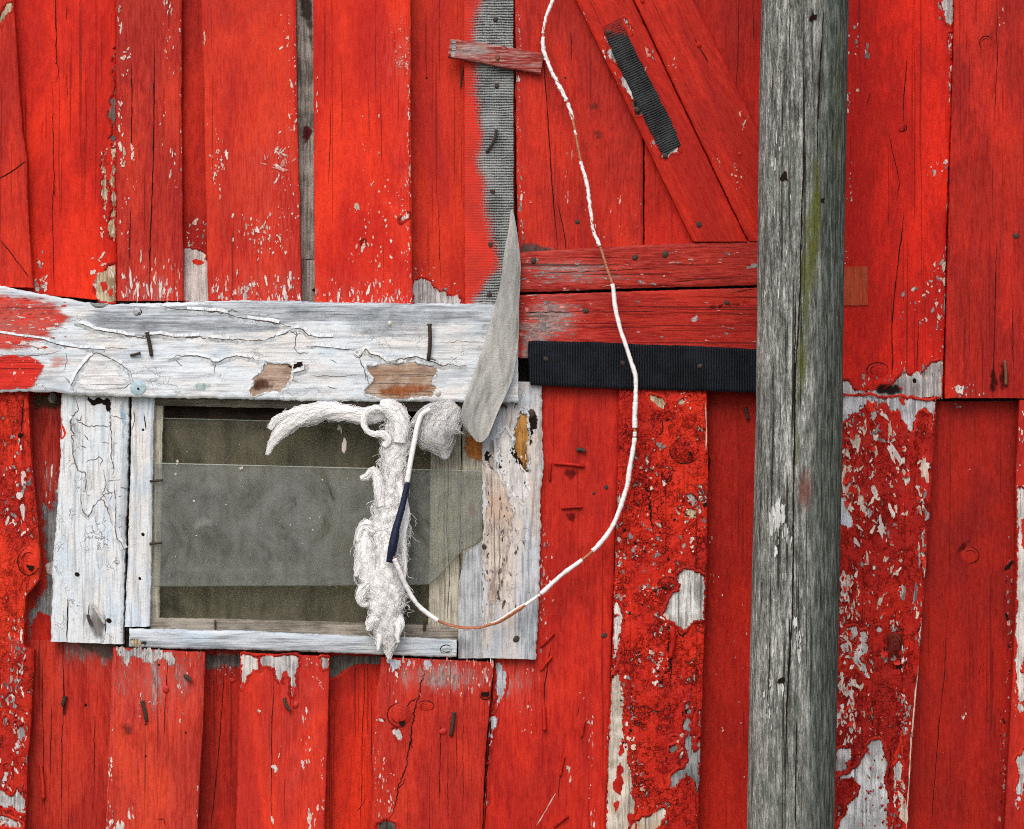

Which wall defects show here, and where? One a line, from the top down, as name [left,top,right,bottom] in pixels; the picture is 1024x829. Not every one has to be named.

peeling [0,432,58,829]
crack [0,46,475,550]
peeling [247,359,294,398]
peeling [89,16,472,333]
peeling [116,638,509,764]
crack [388,659,425,819]
peeling [586,479,719,829]
peeling [638,465,673,492]
peeling [645,391,691,411]
peeling [835,345,985,829]